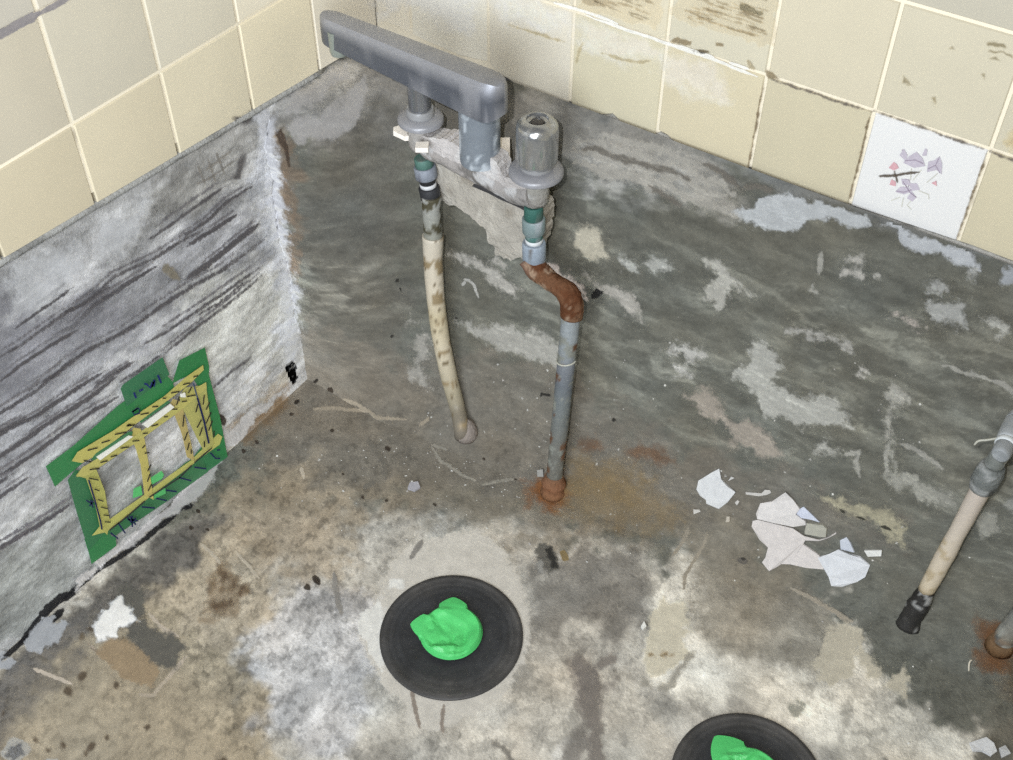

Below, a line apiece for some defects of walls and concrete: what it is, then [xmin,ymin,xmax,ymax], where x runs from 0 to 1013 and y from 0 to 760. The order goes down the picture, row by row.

spalling [24,615,67,654]
spalling [0,650,16,669]